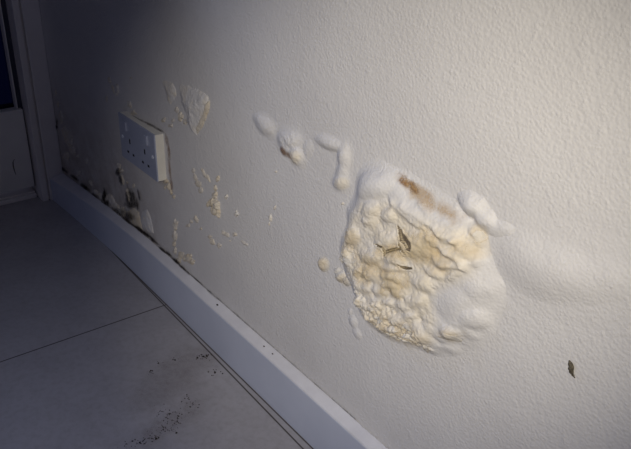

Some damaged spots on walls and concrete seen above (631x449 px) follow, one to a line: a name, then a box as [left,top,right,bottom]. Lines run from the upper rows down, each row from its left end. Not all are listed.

leakage [116,190,196,280]
crack [375,226,412,270]